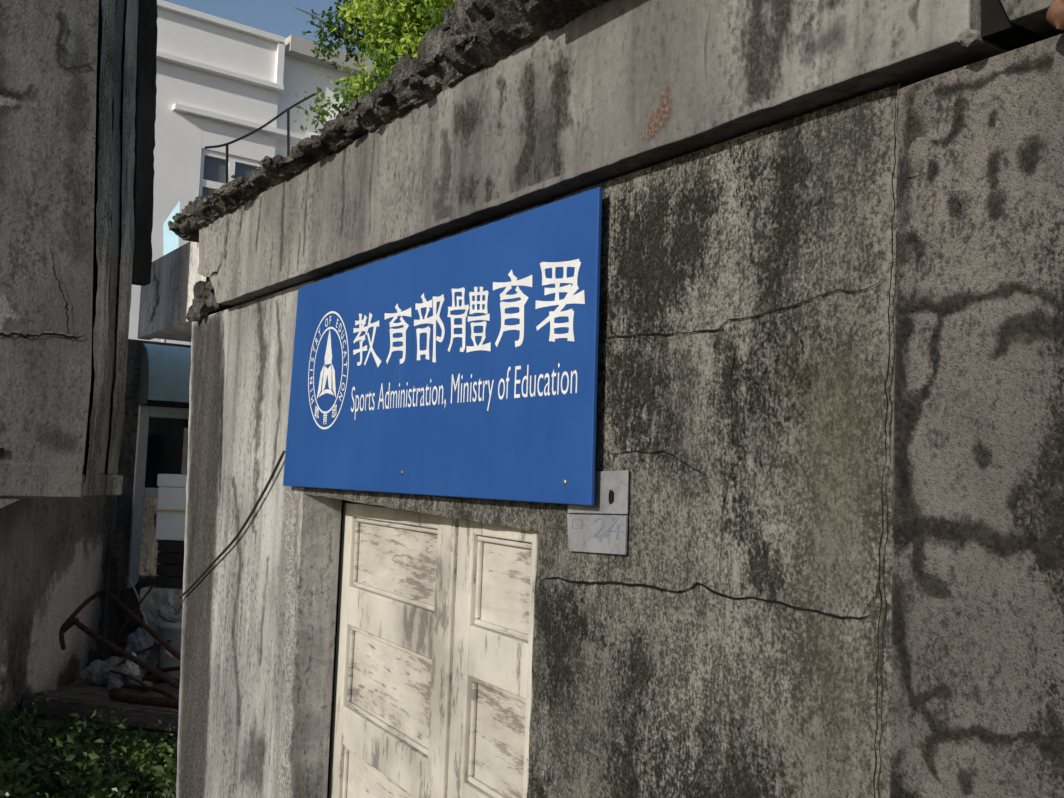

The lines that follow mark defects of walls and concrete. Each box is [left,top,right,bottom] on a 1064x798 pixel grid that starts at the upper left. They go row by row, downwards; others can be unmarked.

spalling [168,0,612,243]
damp [433,98,498,219]
damp [512,51,573,191]
crack [0,248,84,339]
spalling [186,277,235,322]
damp [597,121,832,610]
crack [539,78,899,798]
damp [532,581,797,798]